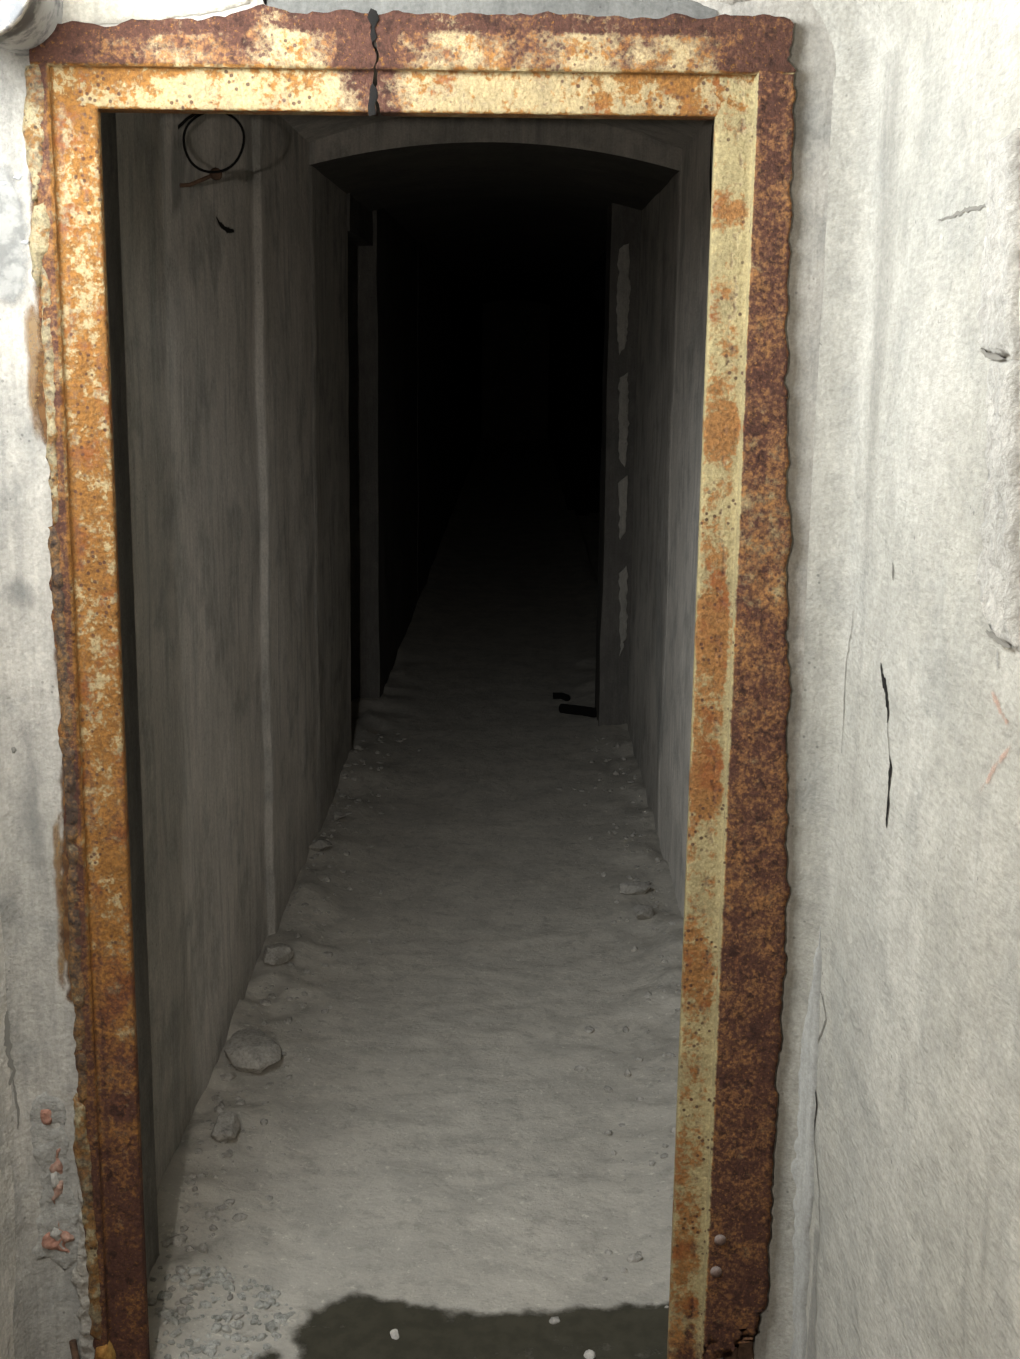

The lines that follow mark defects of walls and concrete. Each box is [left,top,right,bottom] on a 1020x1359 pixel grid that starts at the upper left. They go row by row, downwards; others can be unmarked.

spalling [62,0,750,30]
corrosion [26,286,47,444]
spalling [975,128,1020,652]
crack [880,665,892,828]
corrosion [54,767,72,1002]
corrosion [720,1342,754,1359]